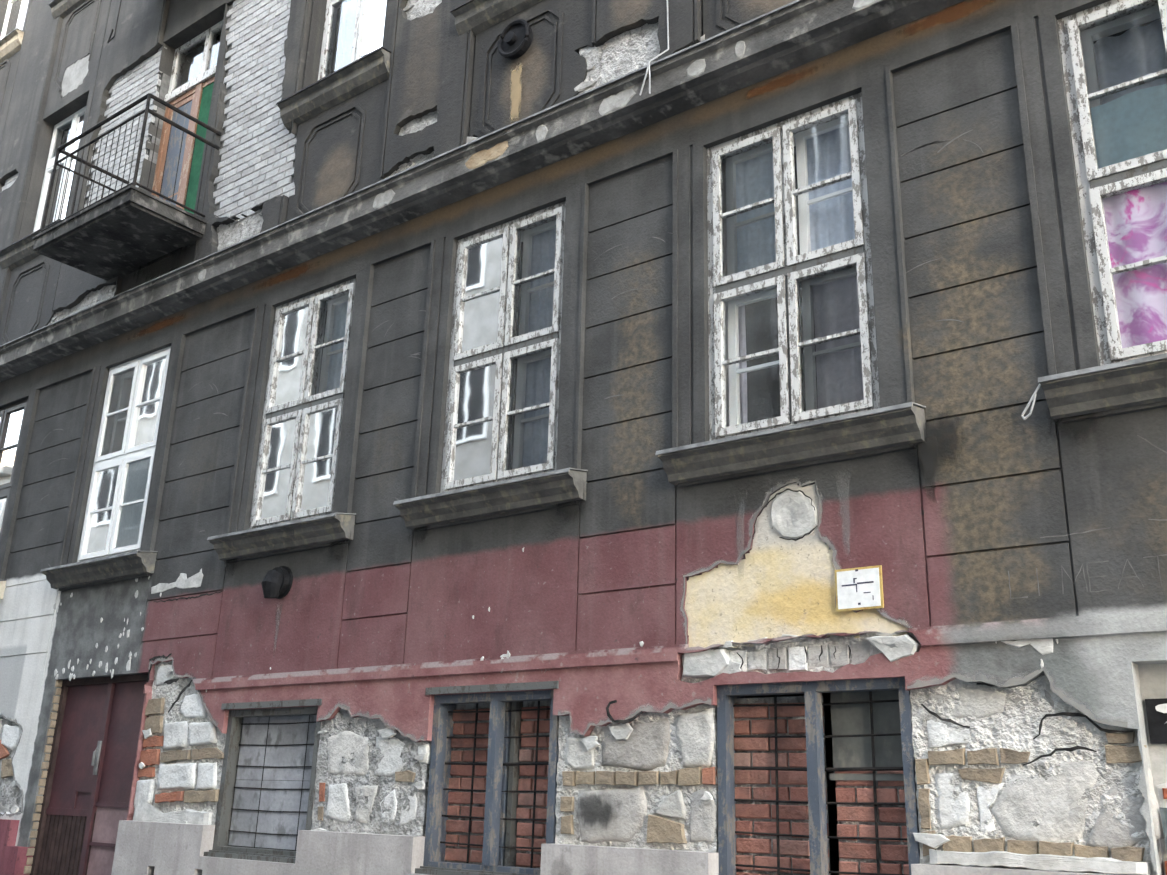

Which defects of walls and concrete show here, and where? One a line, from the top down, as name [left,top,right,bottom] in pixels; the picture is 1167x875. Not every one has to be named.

flaking render [84,47,167,208]
flaking render [213,0,297,251]
spalling [574,22,660,116]
peeling [135,568,203,598]
peeling [680,479,921,683]
spalling [0,714,23,816]
spalling [133,657,226,825]
spalling [311,703,431,836]
spalling [555,699,718,852]
crack [921,704,970,728]
spalling [907,638,1167,875]
crack [1023,712,1134,766]